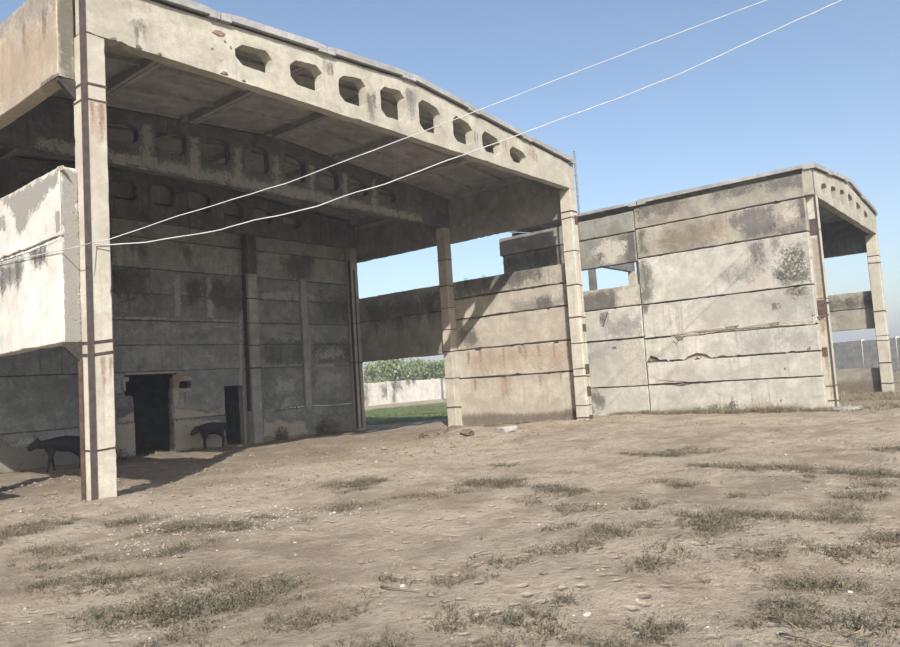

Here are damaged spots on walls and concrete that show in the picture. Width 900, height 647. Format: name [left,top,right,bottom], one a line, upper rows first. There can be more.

water stain [729,199,806,237]
water stain [0,247,45,293]
water stain [774,248,811,294]
spalling [657,317,819,340]